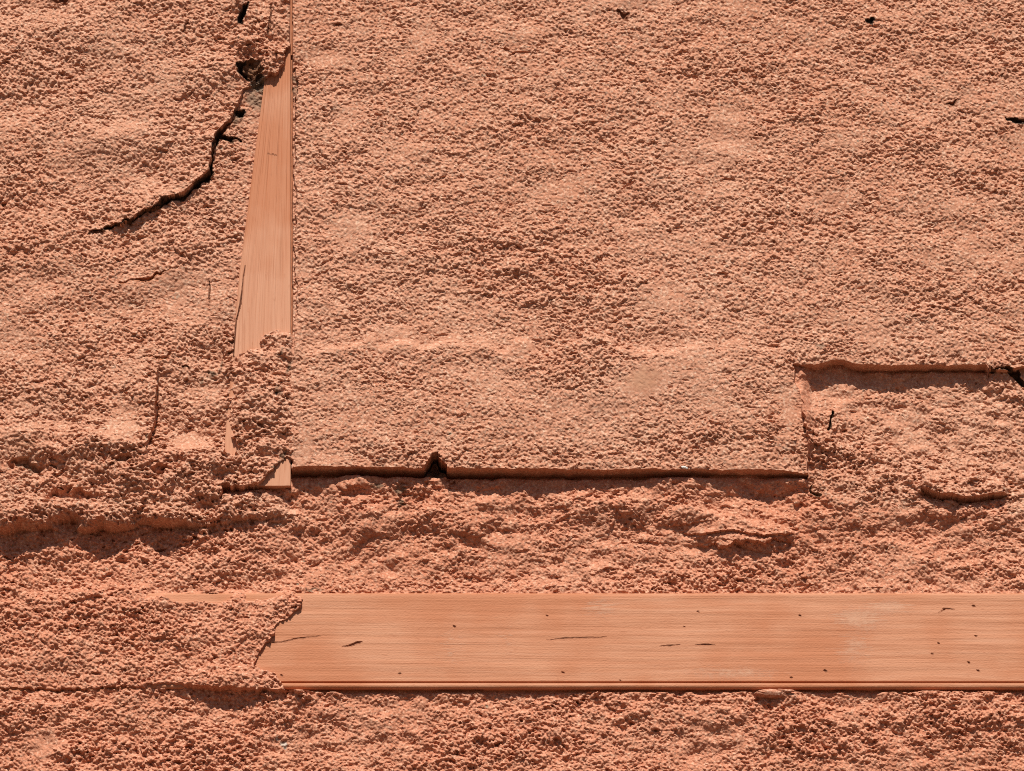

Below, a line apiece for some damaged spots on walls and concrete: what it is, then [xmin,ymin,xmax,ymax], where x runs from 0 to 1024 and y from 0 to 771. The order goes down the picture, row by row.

flaking render [235,32,290,83]
crack [88,116,242,235]